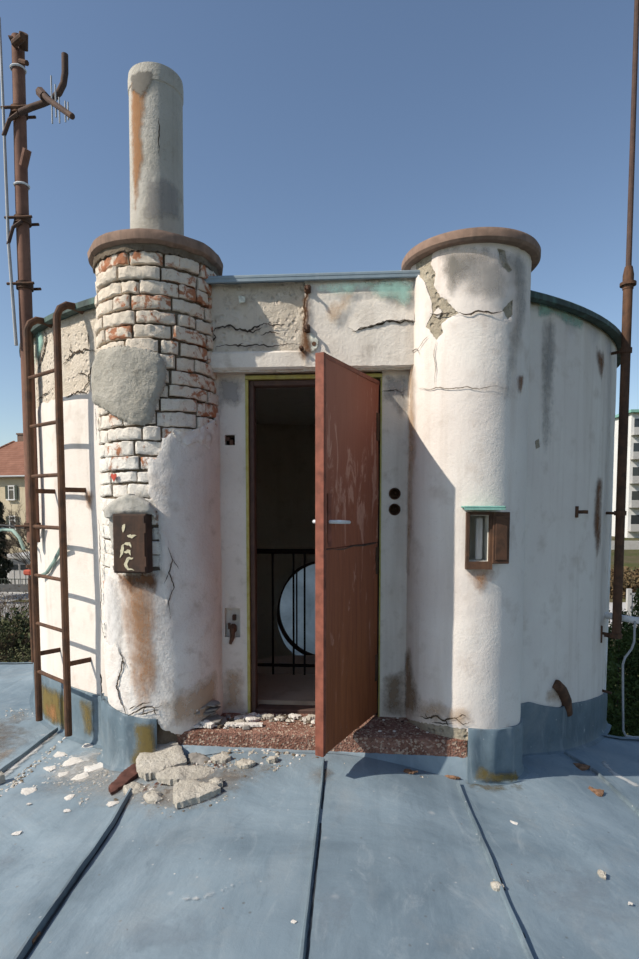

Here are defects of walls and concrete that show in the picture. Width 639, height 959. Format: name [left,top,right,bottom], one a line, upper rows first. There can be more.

rust [131,90,144,193]
flaking render [34,309,98,409]
rust [300,297,311,359]
crack [379,337,507,396]
crack [430,308,502,316]
crack [98,521,160,716]
rust [119,573,156,691]
crack [164,548,179,619]
damp [388,653,415,712]